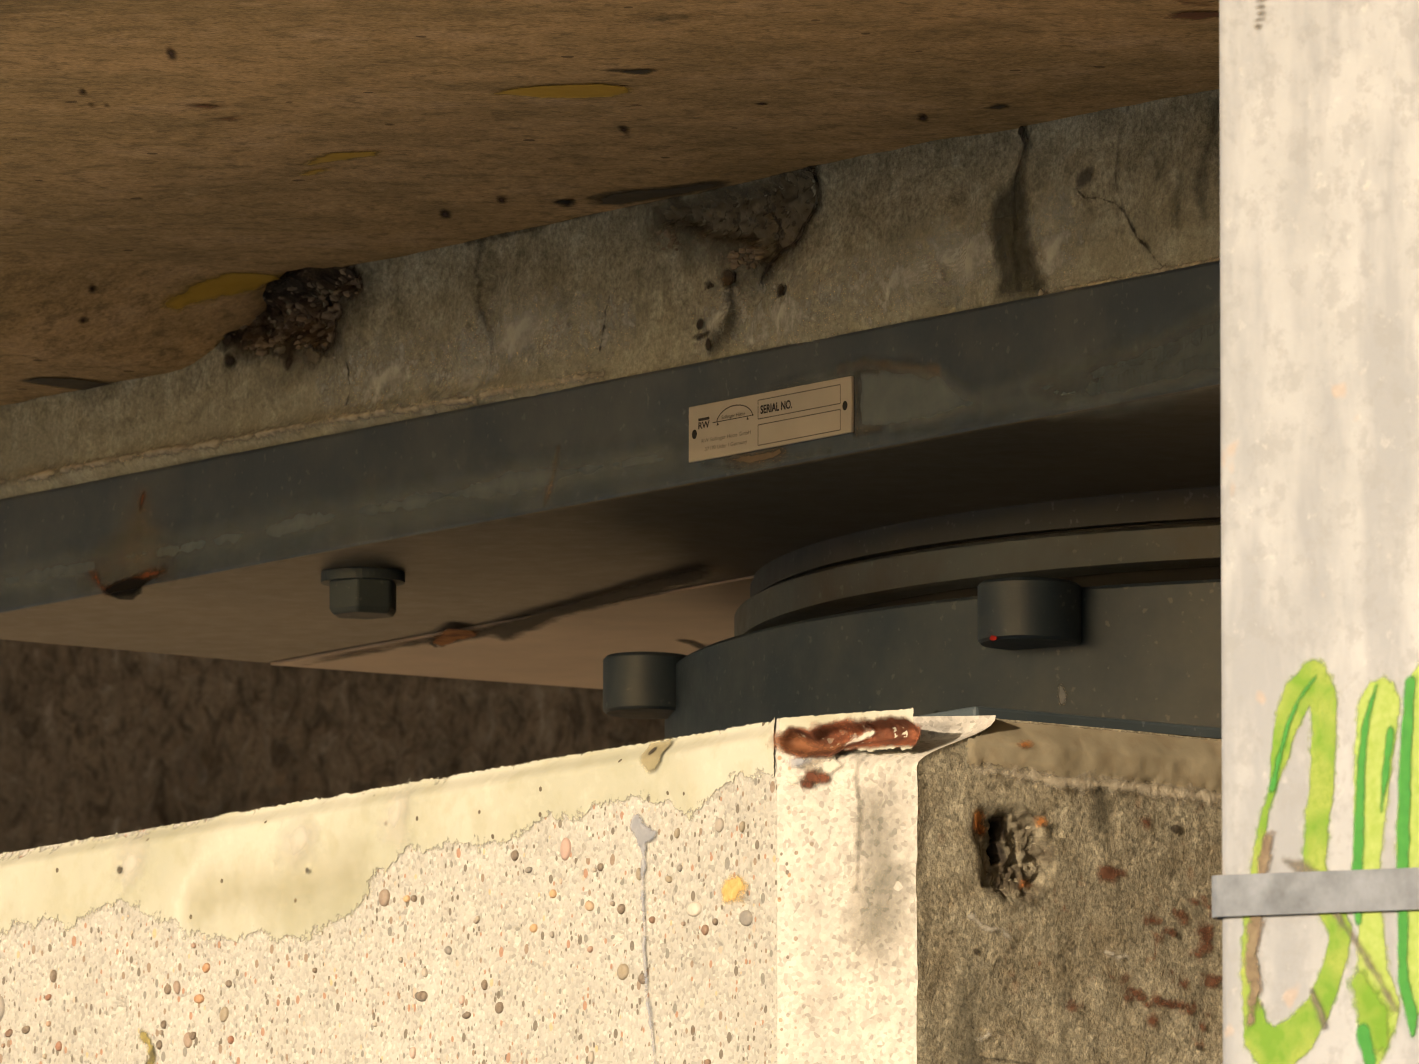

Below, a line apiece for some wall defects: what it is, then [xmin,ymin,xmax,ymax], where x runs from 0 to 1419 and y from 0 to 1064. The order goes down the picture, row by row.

spalling [217,264,363,370]
spalling [654,166,820,285]
leakage [694,180,1084,354]
crack [1077,169,1162,266]
corrosion [90,533,166,600]
peeling [966,720,1222,795]
peeling [0,708,921,943]
spalling [970,803,1054,909]